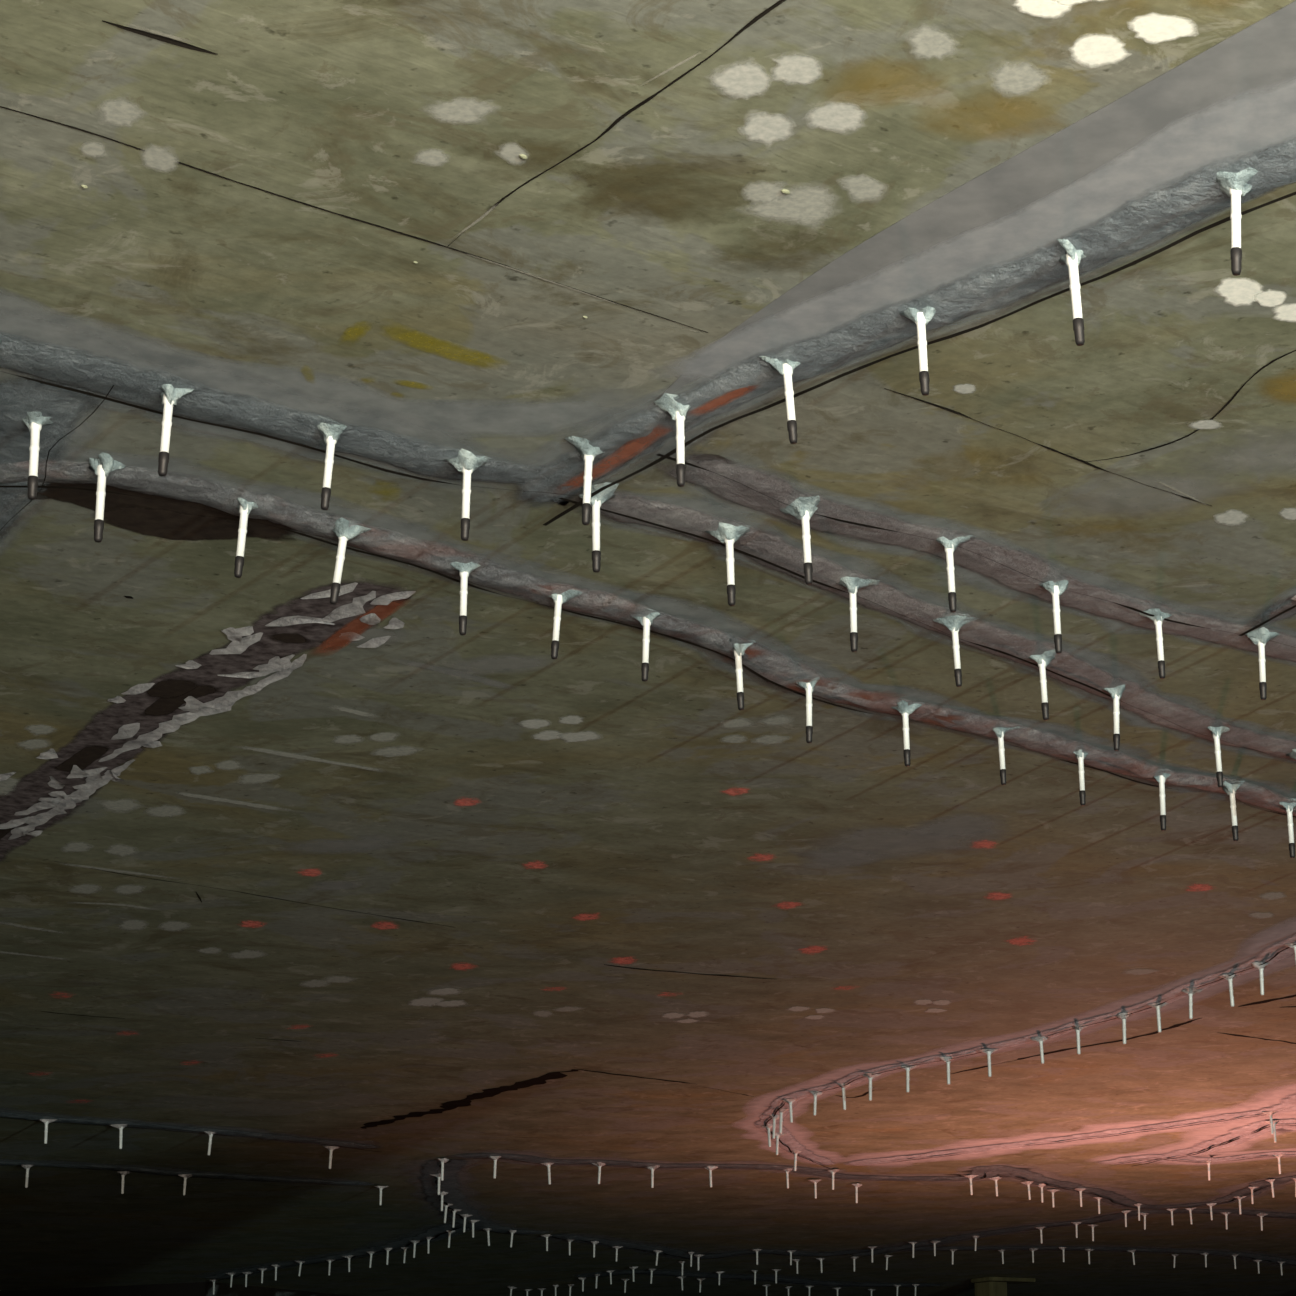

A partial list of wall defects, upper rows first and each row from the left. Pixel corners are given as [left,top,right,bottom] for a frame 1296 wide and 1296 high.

crack [0,106,146,152]
crack [176,0,786,333]
crack [0,138,1296,817]
peeling [0,582,416,861]
crack [0,920,1296,1281]